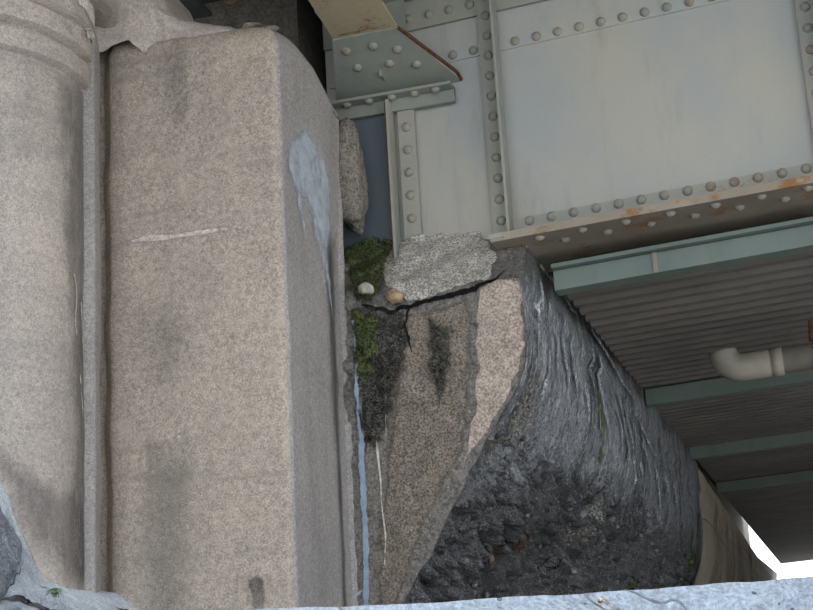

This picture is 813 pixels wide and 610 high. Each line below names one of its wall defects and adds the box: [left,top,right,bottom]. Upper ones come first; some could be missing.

rust [397,26,463,81]
rust [503,174,813,240]
leakage [288,130,343,532]
crack [362,269,506,352]